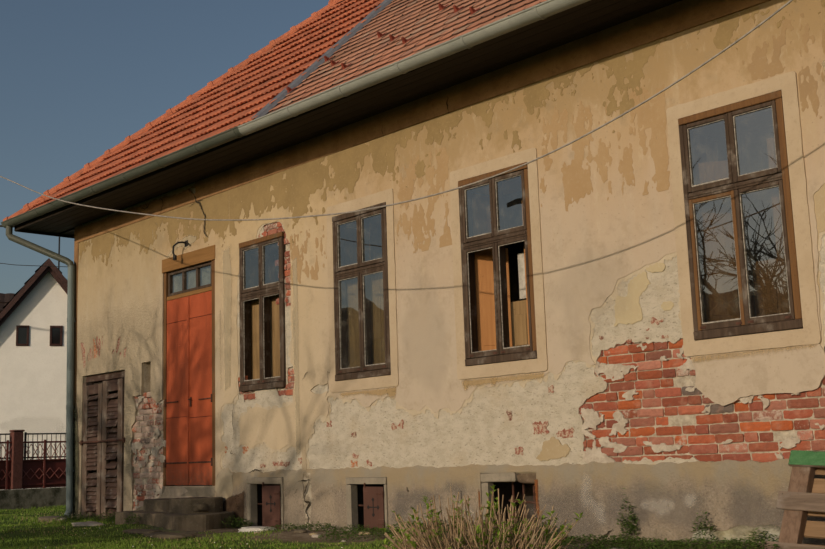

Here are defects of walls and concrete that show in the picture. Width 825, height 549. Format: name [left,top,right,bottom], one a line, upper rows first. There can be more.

peeling [710,6,825,119]
peeling [523,38,670,211]
crack [192,195,206,236]
flaking render [79,90,825,528]
crack [294,479,310,523]